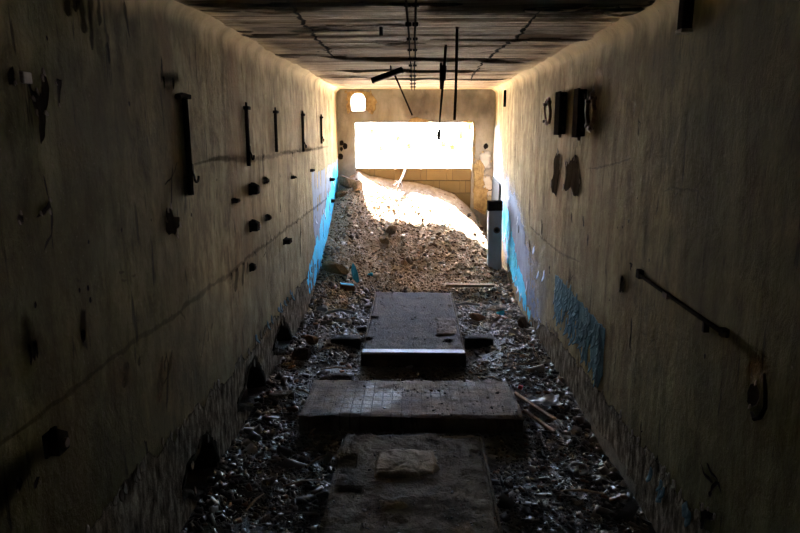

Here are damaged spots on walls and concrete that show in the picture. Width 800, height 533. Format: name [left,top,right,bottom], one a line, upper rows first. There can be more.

crack [200,1,655,81]
peeling [463,120,545,330]
peeling [550,148,581,196]
spalling [85,140,347,533]
peeling [552,274,605,388]